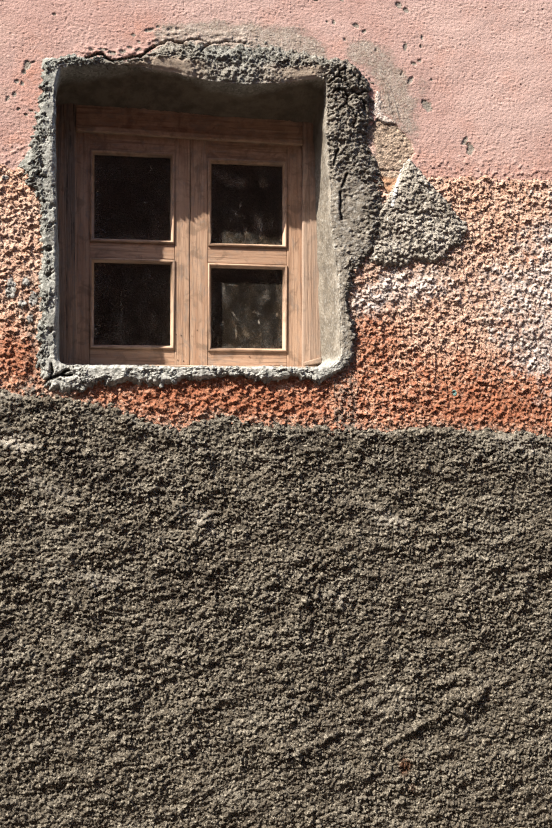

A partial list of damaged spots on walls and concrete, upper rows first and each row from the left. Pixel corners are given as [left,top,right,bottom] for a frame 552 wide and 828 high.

crack [85,41,236,70]
flaking render [366,91,468,268]